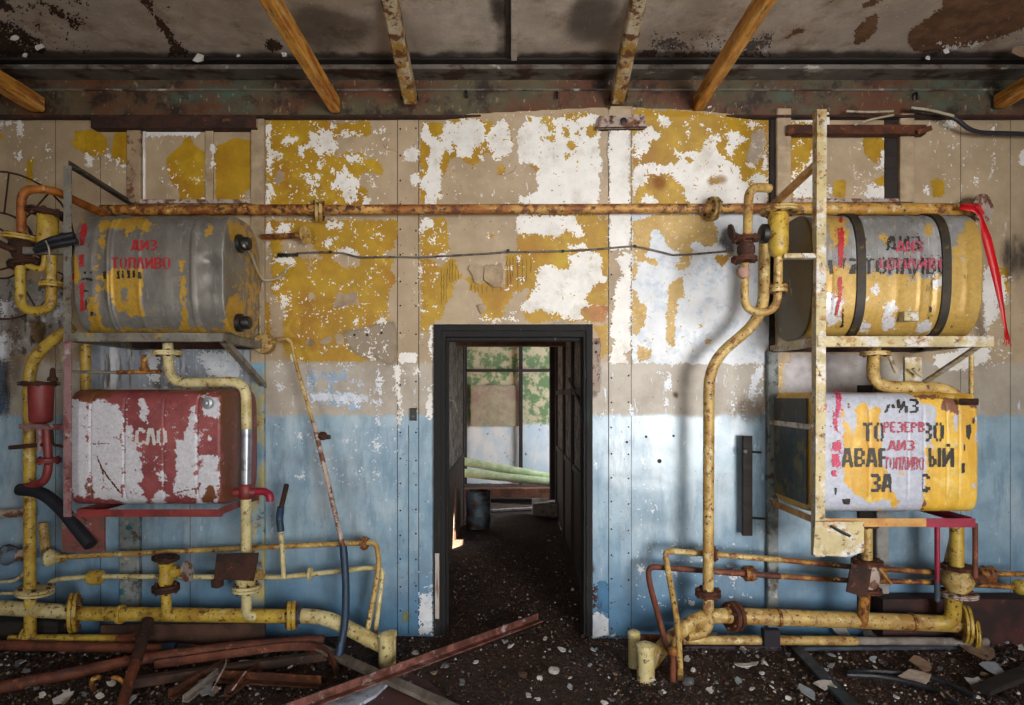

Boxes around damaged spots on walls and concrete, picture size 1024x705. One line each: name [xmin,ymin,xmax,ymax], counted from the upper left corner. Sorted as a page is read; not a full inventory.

peeling [72,129,127,173]
peeling [146,132,251,205]
peeling [266,106,769,484]